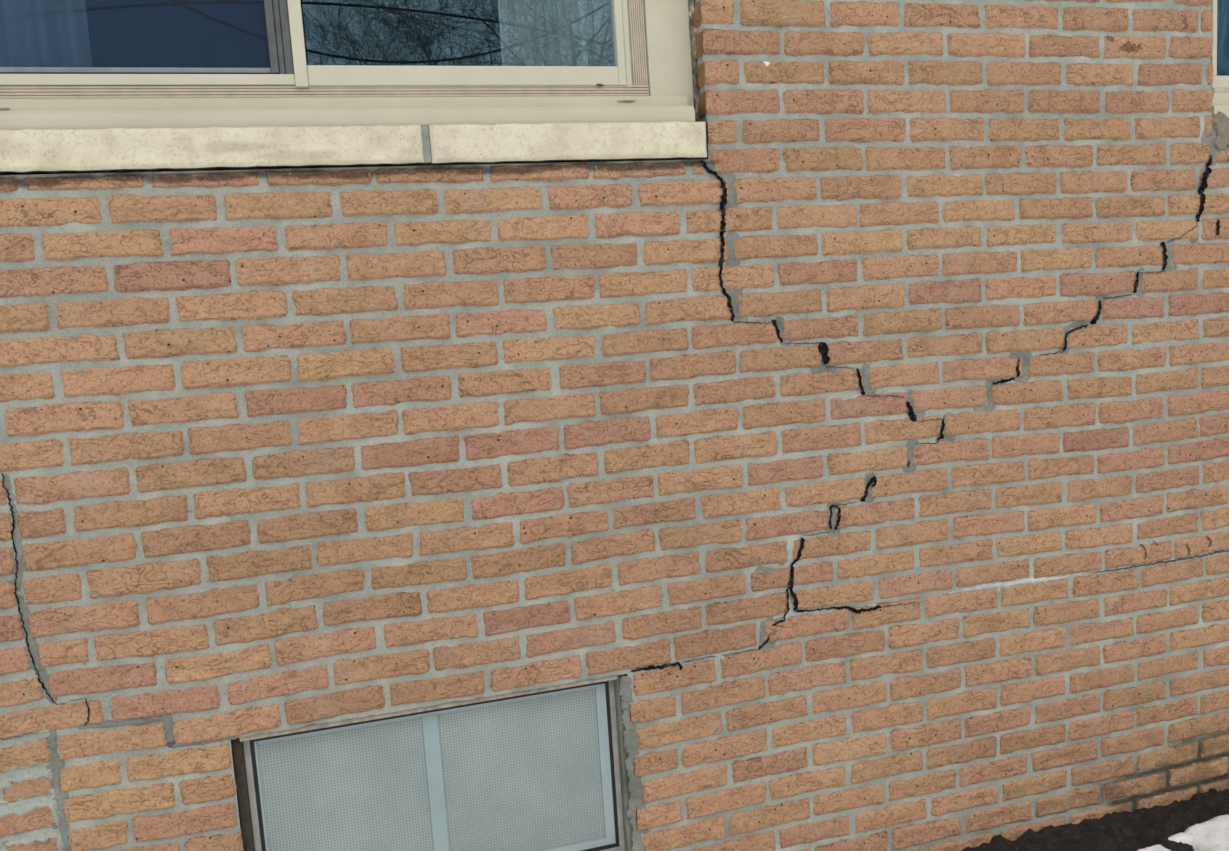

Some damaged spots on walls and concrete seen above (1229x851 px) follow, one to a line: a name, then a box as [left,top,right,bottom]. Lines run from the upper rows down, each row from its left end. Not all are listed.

crack [2,473,90,725]
crack [631,128,1229,672]